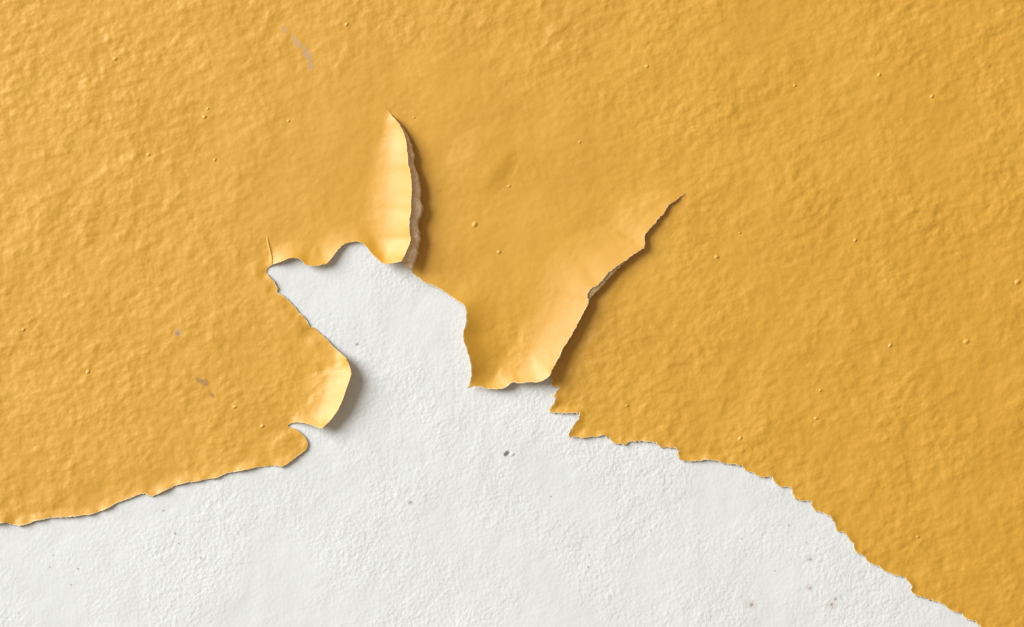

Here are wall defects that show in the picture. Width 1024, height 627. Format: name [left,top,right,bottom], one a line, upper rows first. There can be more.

peeling [0,107,980,627]